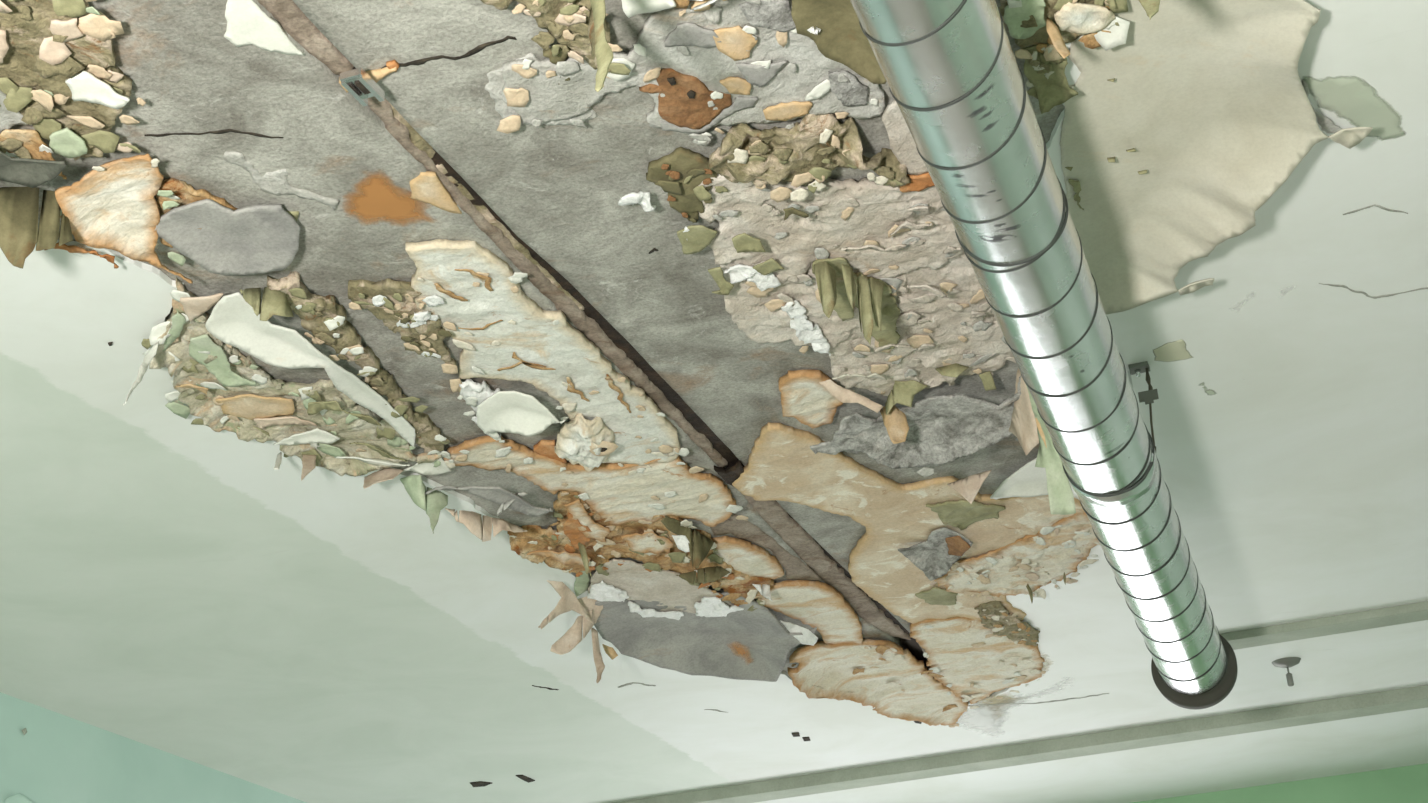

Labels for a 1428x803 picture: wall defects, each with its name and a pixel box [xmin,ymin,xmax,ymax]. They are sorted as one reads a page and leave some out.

flaking render [995,0,1160,143]
spalling [1302,79,1342,133]
spalling [0,0,649,542]
spalling [293,0,1040,504]
crack [1319,283,1428,299]
crack [1343,204,1408,215]
spalling [648,410,825,673]
spalling [776,500,866,572]
spalling [898,511,1100,648]
spalling [852,604,995,727]